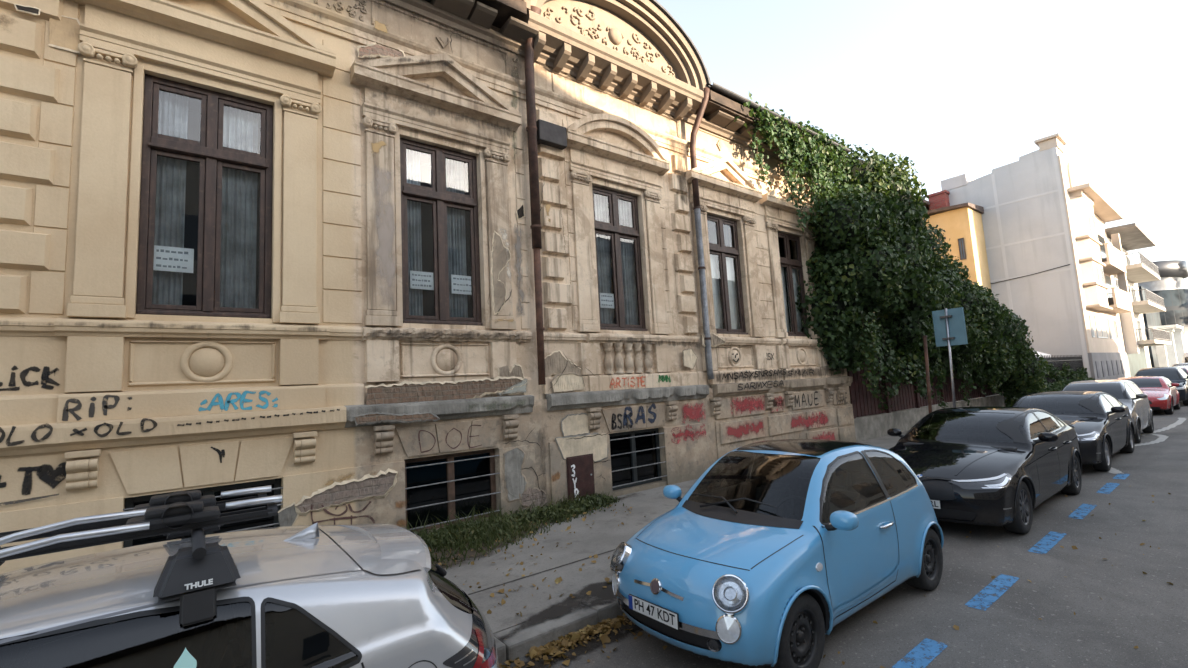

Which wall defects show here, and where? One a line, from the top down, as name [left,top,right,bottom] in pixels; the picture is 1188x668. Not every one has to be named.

flaking render [357,42,405,58]
flaking render [491,230,511,315]
flaking render [545,350,587,378]
flaking render [354,364,528,426]
flaking render [555,413,608,462]
flaking render [278,468,398,527]